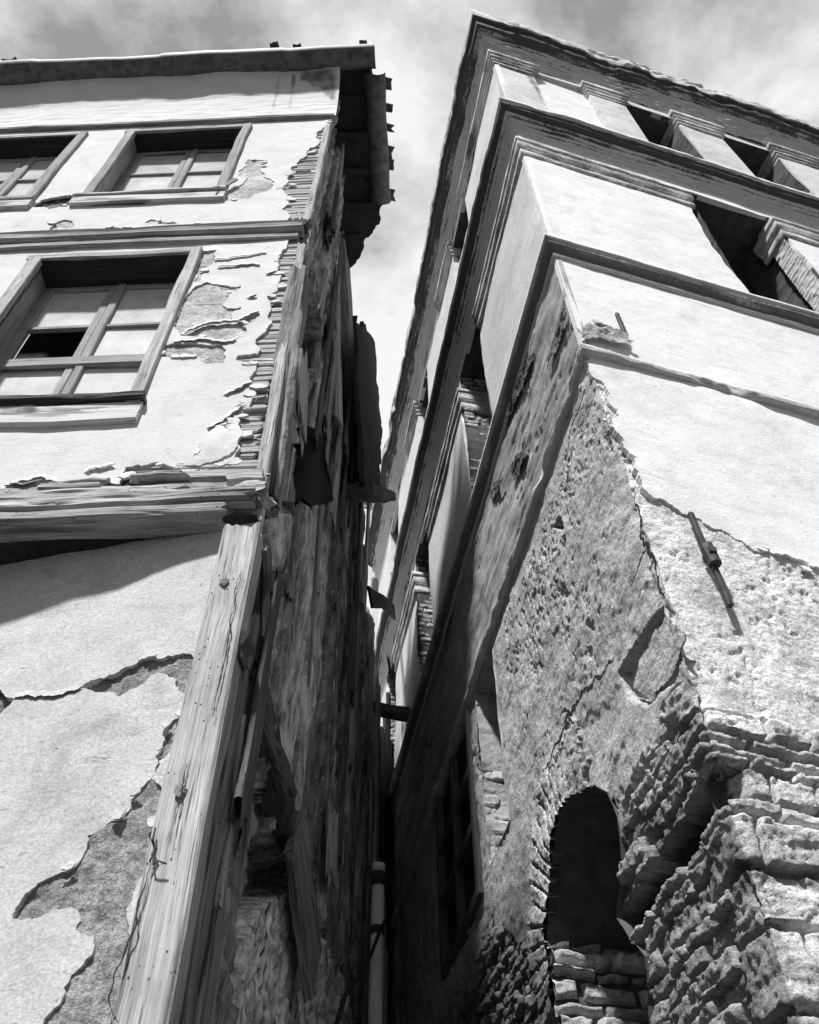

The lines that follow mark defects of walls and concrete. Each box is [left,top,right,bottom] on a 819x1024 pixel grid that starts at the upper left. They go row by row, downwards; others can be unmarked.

peeling [225,158,297,202]
spalling [268,260,287,304]
peeling [161,251,260,364]
spalling [243,383,269,397]
spalling [236,413,253,438]
spalling [490,441,527,501]
spalling [799,562,819,573]
spalling [88,651,193,696]
spalling [633,617,687,701]
spalling [0,693,12,713]
crack [546,657,614,769]
spalling [16,707,182,1024]